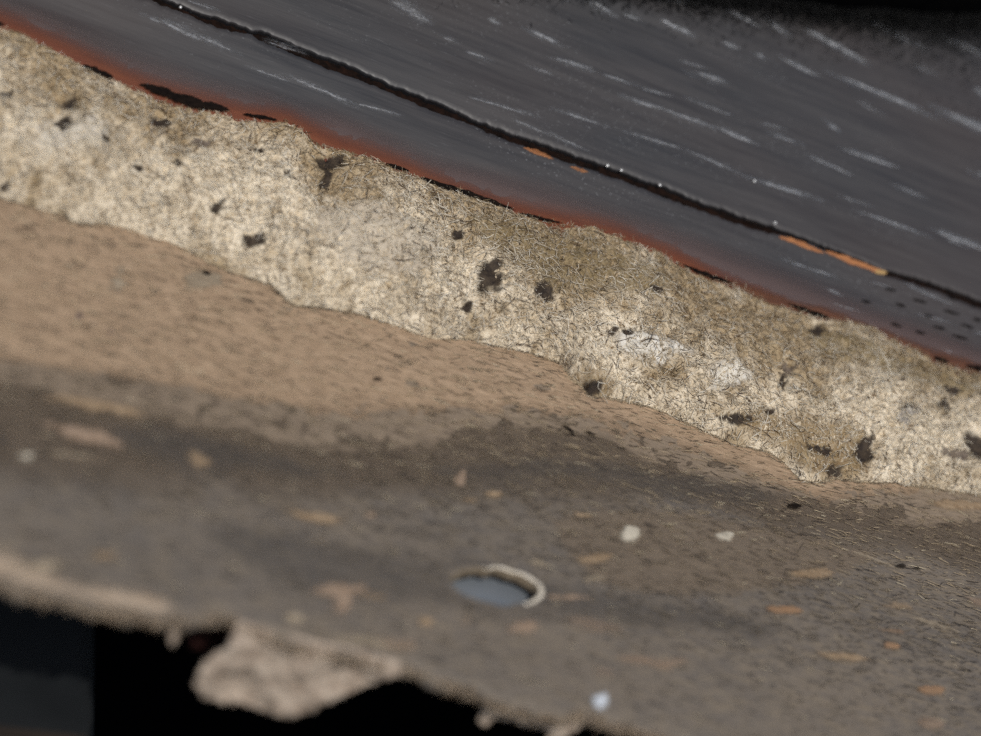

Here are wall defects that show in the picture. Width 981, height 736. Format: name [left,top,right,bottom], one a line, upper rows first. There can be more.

crack [83,64,114,78]
spalling [53,98,77,132]
spalling [150,117,173,129]
crack [139,0,825,251]
spalling [314,155,347,190]
crack [684,264,732,283]
crack [884,273,981,309]
crack [790,303,831,319]
peeling [0,181,981,560]
peeling [792,568,832,577]